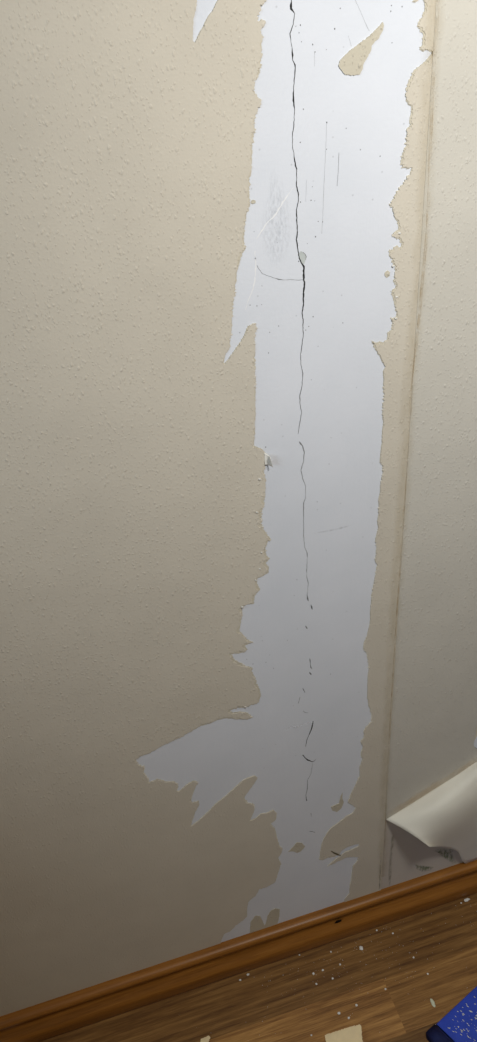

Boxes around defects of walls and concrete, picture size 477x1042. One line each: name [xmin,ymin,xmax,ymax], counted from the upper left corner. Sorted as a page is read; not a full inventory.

peeling [135,0,432,942]
crack [257,0,312,628]
peeling [381,762,477,889]